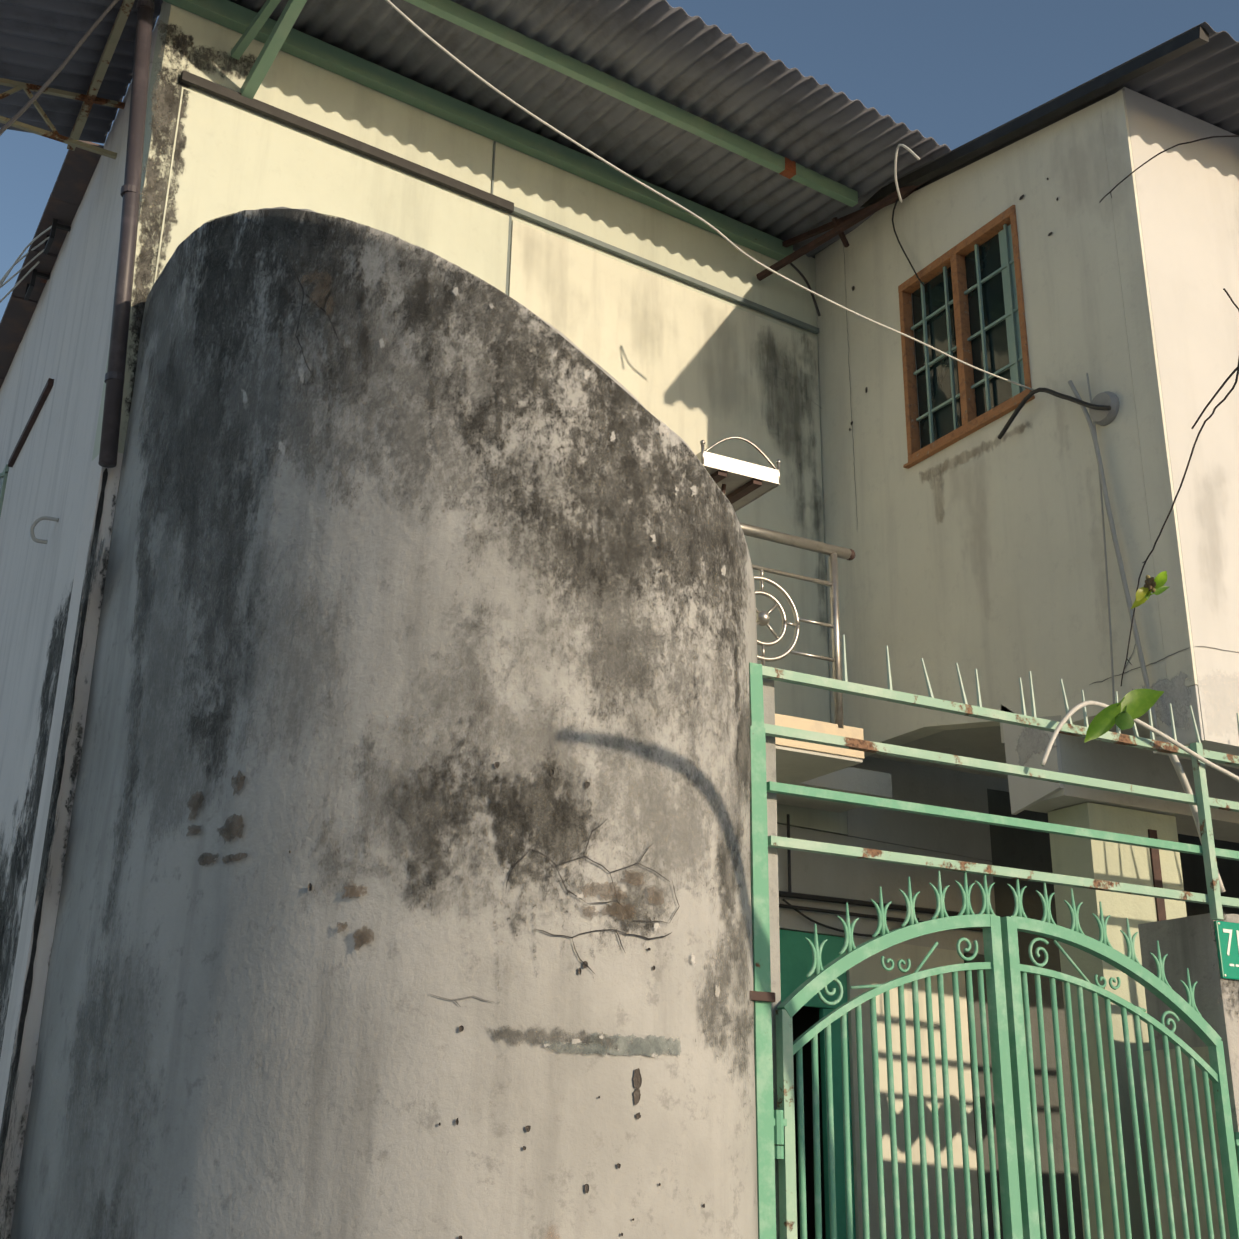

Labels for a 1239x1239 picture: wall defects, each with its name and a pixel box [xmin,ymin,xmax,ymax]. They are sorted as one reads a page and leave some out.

water stain [764,338,808,470]
water stain [125,23,755,1118]
spalling [186,791,204,836]
spalling [198,814,248,865]
spalling [231,771,245,796]
crack [506,819,680,974]
peeling [492,1025,681,1119]